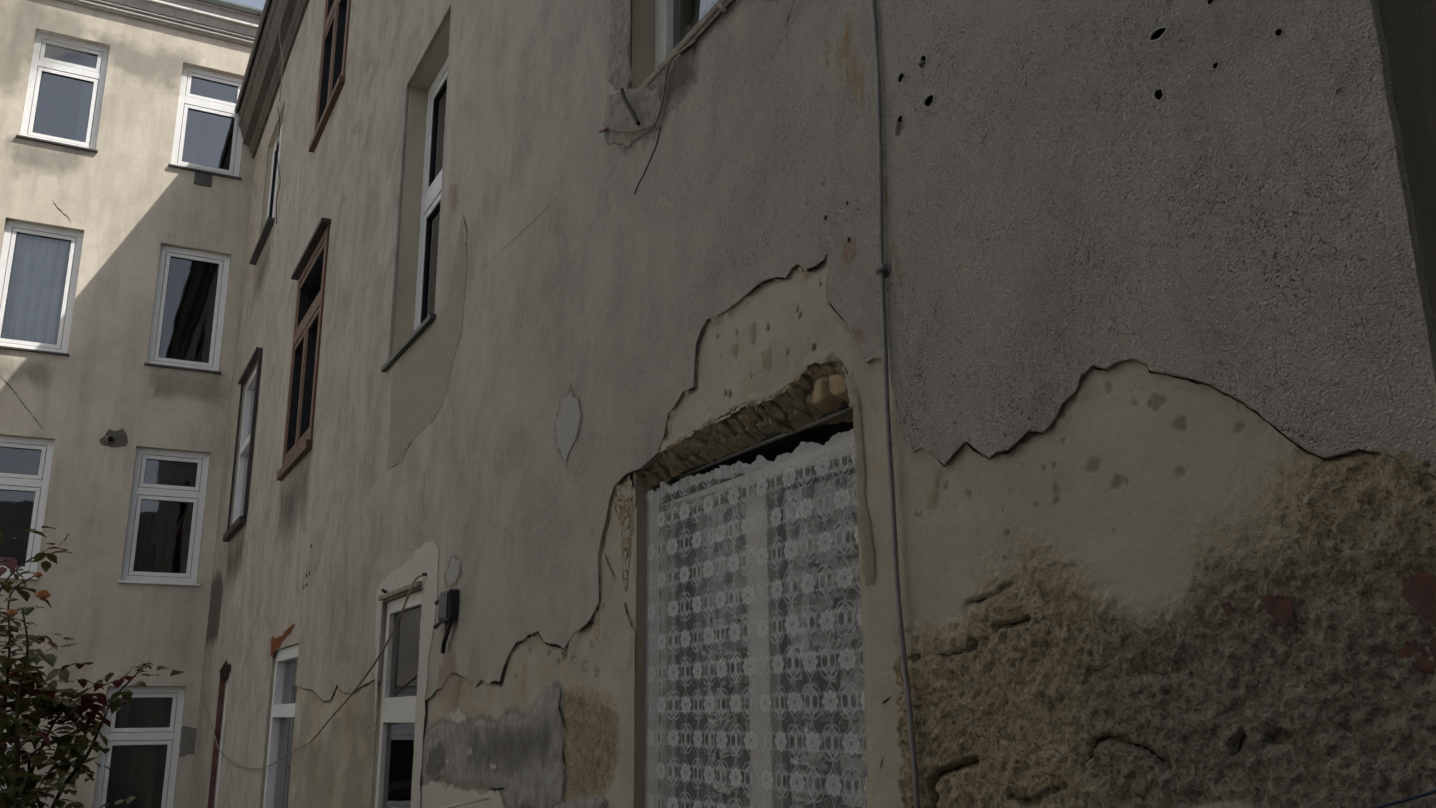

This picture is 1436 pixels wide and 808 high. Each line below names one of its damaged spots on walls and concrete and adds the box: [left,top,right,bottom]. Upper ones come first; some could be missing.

flaking render [420,261,1436,808]